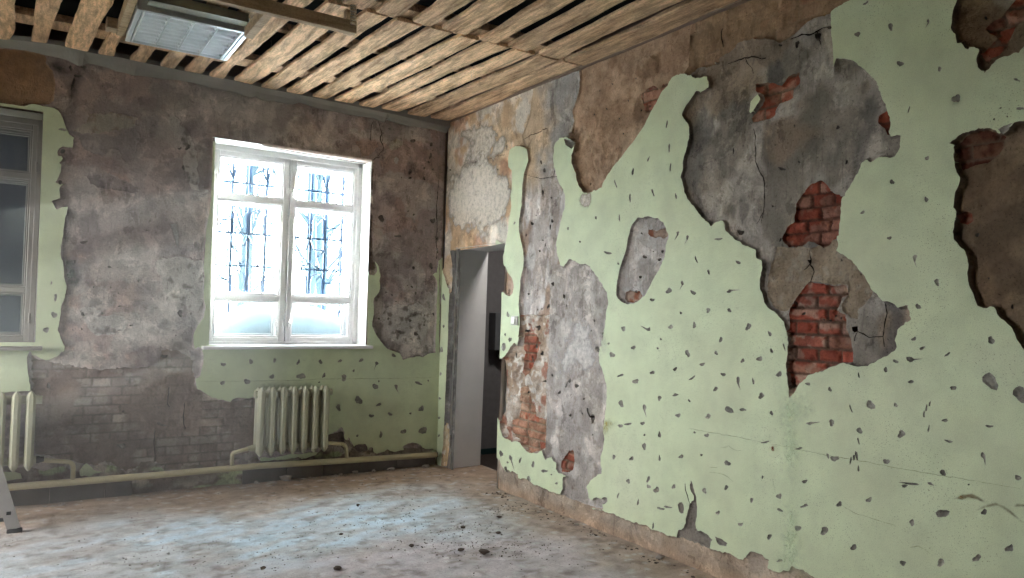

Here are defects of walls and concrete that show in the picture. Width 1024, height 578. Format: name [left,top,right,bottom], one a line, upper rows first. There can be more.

spalling [0,49,86,106]
spalling [951,0,1024,73]
peeling [262,143,384,275]
spalling [429,148,448,270]
spalling [503,272,514,296]
spalling [564,0,911,398]
spalling [950,121,1024,349]
flaking render [3,349,450,502]
spalling [498,304,585,453]
flaking render [561,450,575,472]
flaking render [497,458,814,578]